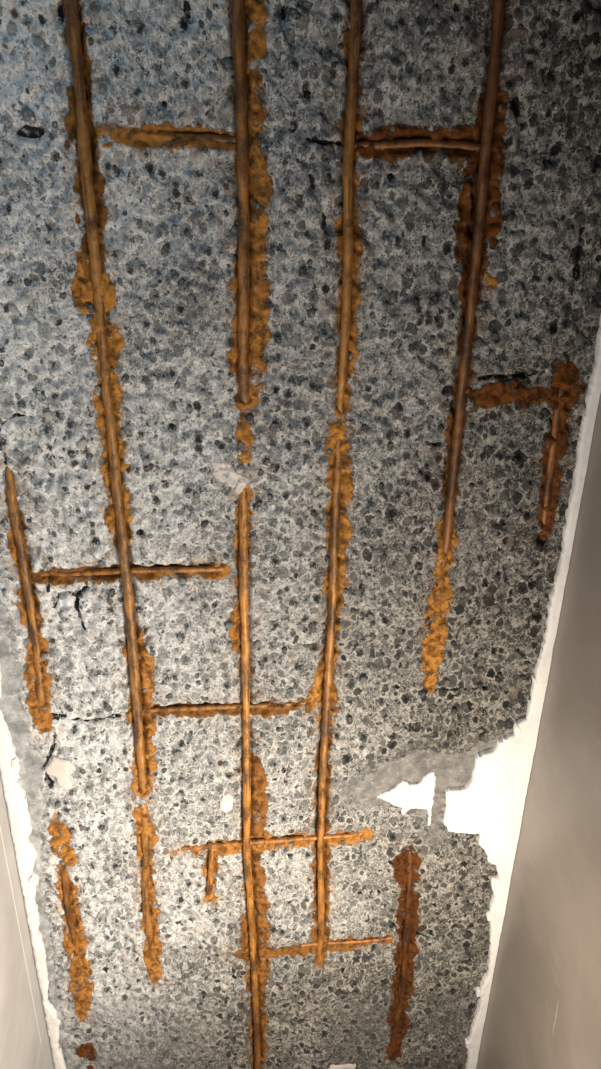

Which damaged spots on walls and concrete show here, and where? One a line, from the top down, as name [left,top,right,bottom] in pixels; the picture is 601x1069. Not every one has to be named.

spalling [357,0,493,138]
corrosion [64,0,274,548]
spalling [0,0,254,1069]
corrosion [5,484,254,733]
corrosion [122,29,509,1069]
corrosion [442,361,586,540]
peeling [440,314,601,1069]
corrosion [48,813,94,1023]
spalling [254,841,318,951]
peeling [377,772,436,825]
corrosion [75,1042,96,1069]